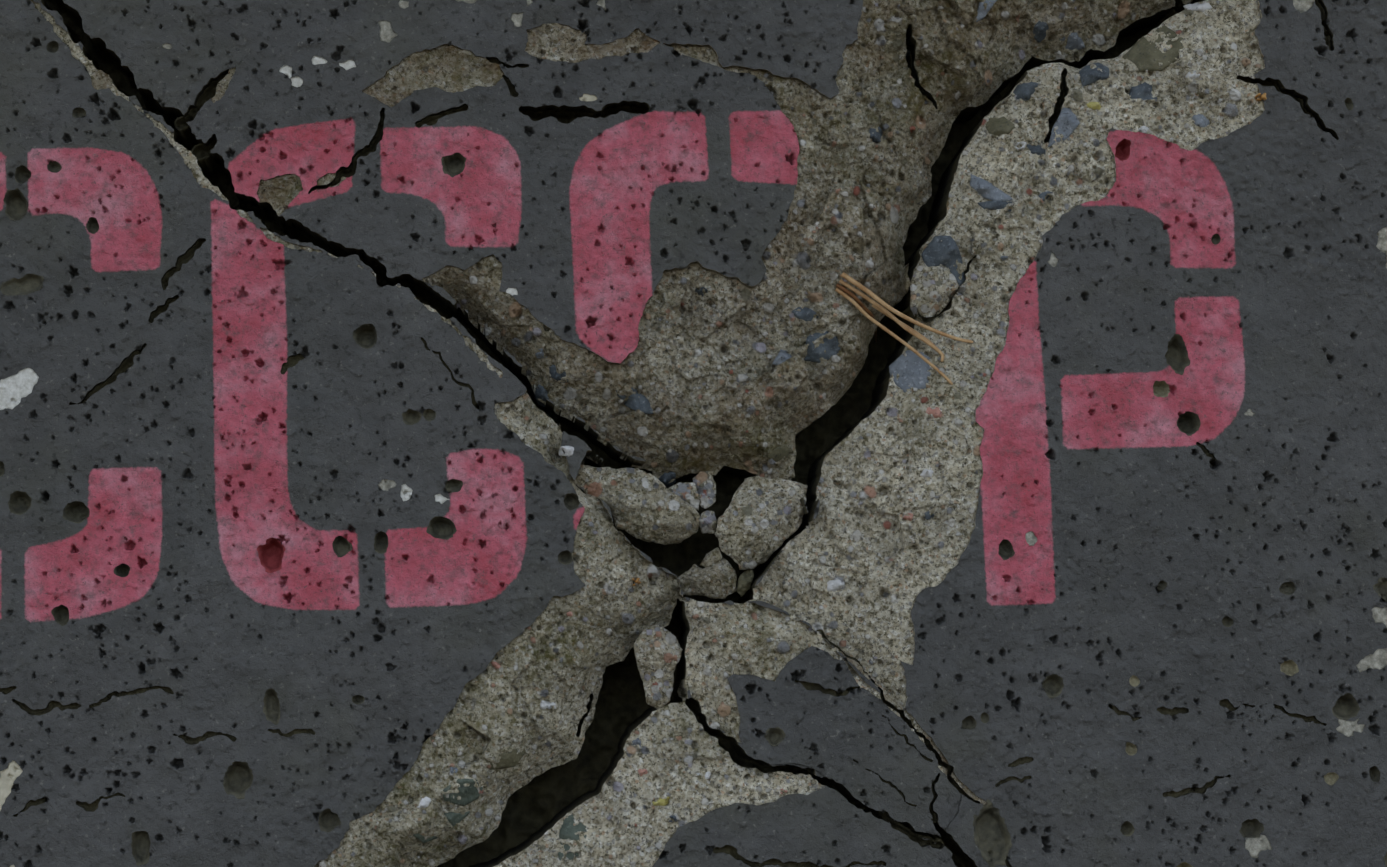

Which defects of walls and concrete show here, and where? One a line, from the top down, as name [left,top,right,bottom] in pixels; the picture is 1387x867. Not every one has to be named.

crack [1315,0,1334,51]
spalling [211,66,236,103]
peeling [279,65,303,87]
crack [1237,75,1339,140]
spalling [257,173,346,216]
crack [30,0,653,475]
spalling [312,0,1267,867]
crack [437,0,1205,867]
crack [0,686,174,716]
crack [1108,699,1327,726]
crack [173,729,315,745]
peeling [1245,834,1273,858]